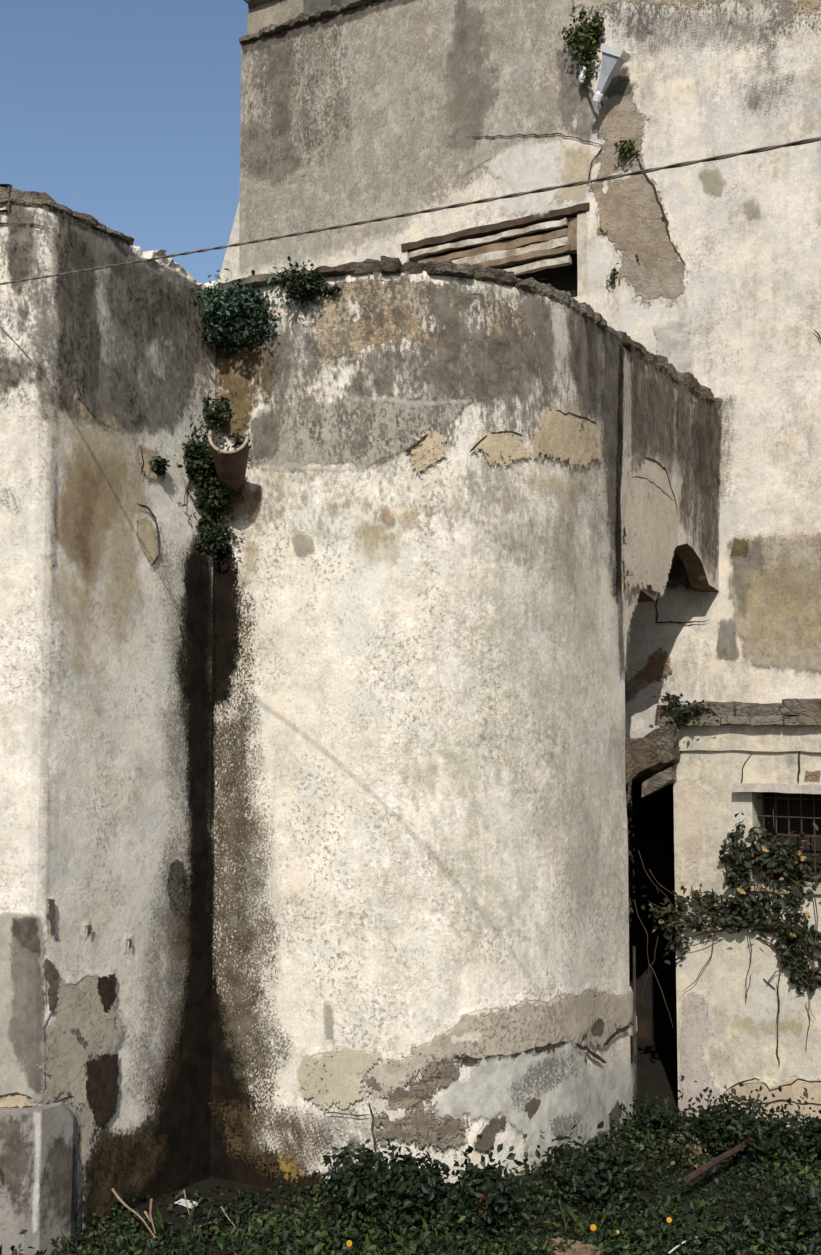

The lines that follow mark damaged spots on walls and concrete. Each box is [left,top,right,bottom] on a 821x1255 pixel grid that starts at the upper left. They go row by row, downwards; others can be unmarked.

damp [239,0,821,273]
flaking render [585,82,690,308]
damp [0,204,218,606]
flaking render [132,511,161,572]
flaking render [132,441,166,486]
flaking render [406,423,447,477]
damp [246,271,821,676]
flaking render [470,398,602,470]
flaking render [622,456,680,597]
damp [0,516,379,1233]
flaking render [0,893,127,1185]
peeling [295,982,638,1158]